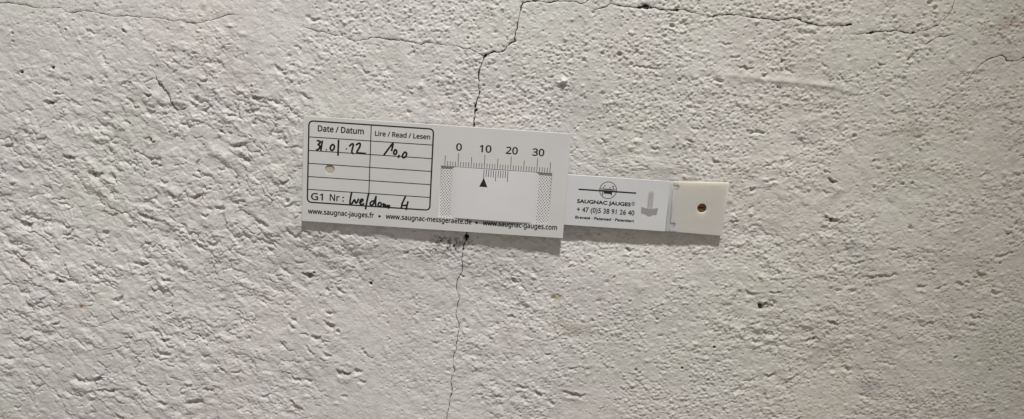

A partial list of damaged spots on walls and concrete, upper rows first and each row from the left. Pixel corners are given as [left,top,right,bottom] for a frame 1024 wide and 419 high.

crack [305,0,955,127]
crack [957,55,1024,77]
crack [446,232,467,419]